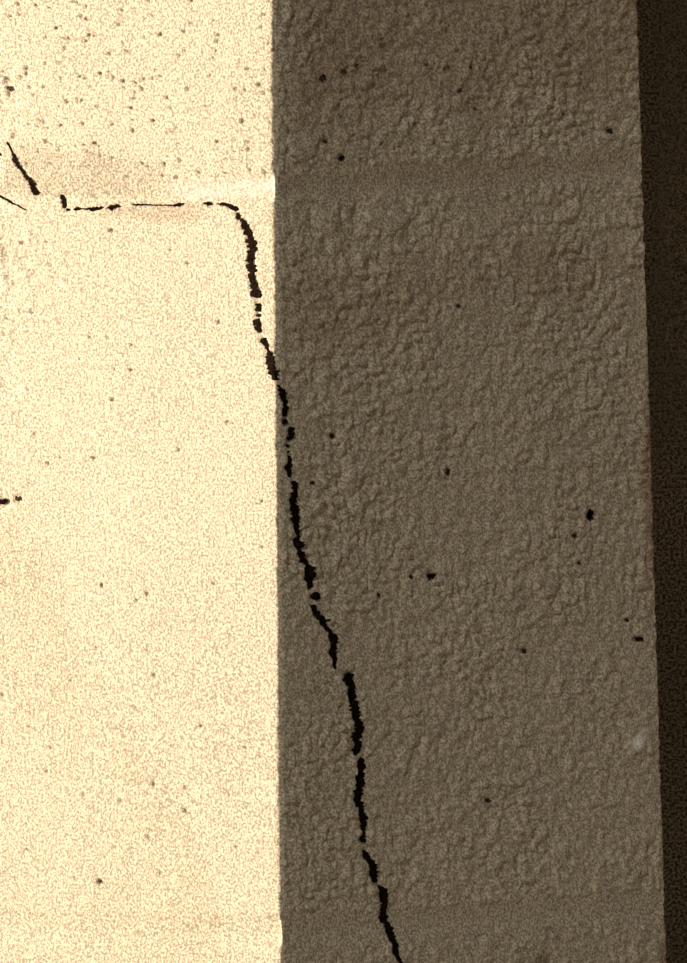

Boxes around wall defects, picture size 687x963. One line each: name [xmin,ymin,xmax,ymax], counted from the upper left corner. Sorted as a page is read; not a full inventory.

crack [0,142,403,963]